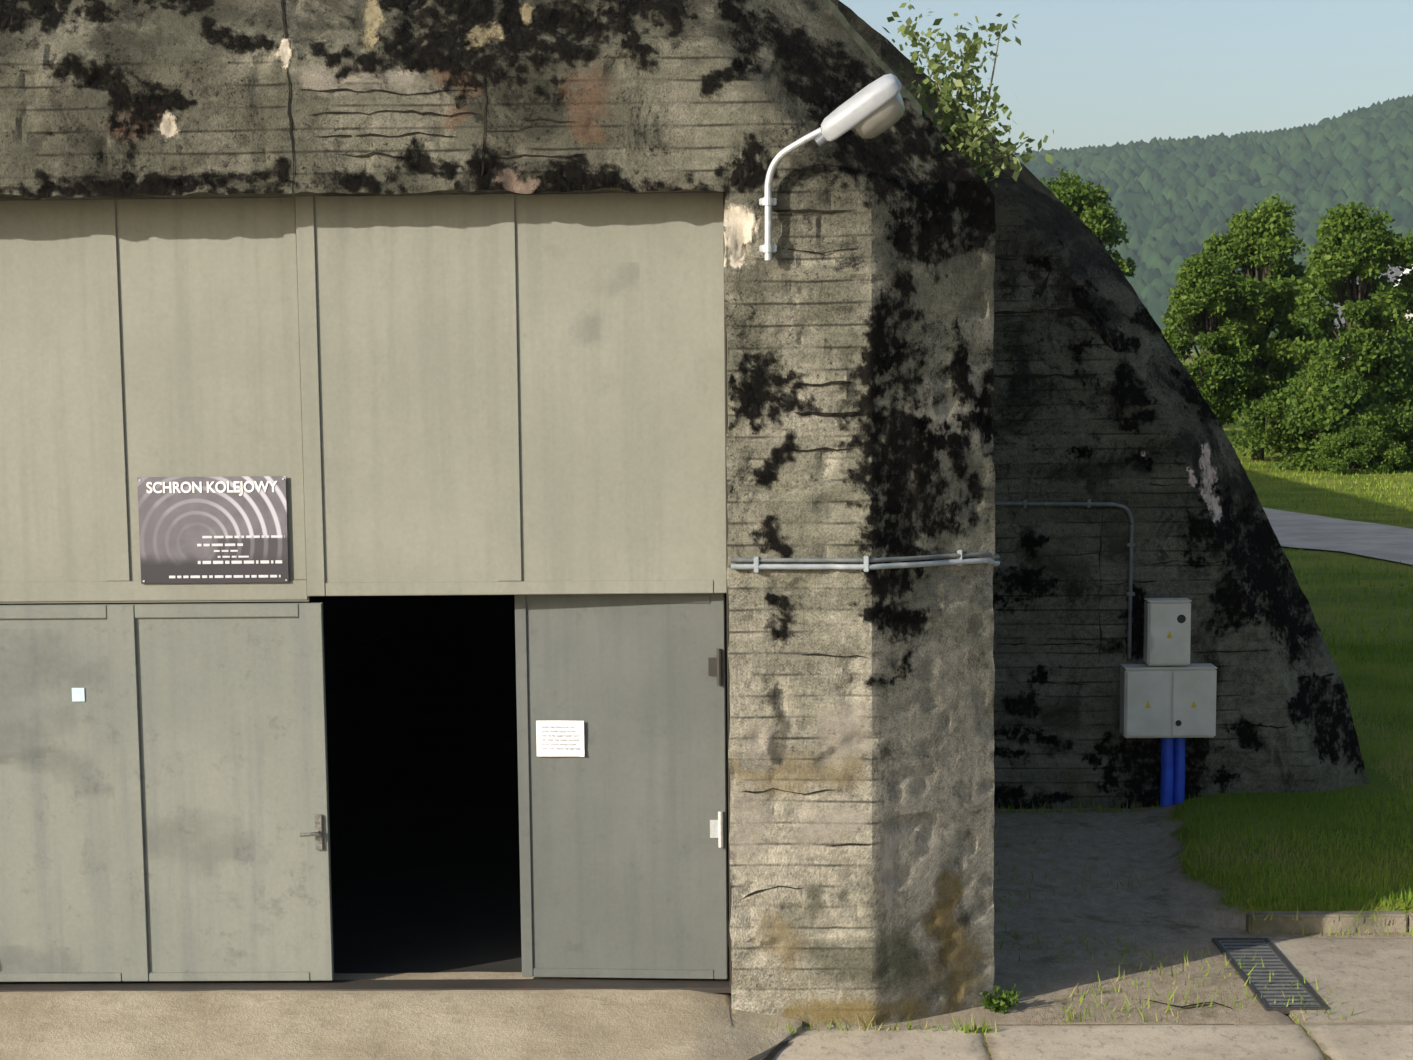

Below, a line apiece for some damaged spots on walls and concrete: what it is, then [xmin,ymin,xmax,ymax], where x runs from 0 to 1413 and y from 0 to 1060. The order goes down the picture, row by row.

damp [0,0,298,200]
crack [281,0,584,193]
damp [309,0,697,108]
damp [333,132,779,198]
spalling [723,205,757,268]
damp [700,0,884,129]
damp [727,98,996,688]
damp [1066,281,1222,472]
spalling [1186,442,1223,522]
damp [1109,584,1147,661]
damp [1182,476,1365,775]
damp [994,664,1265,809]